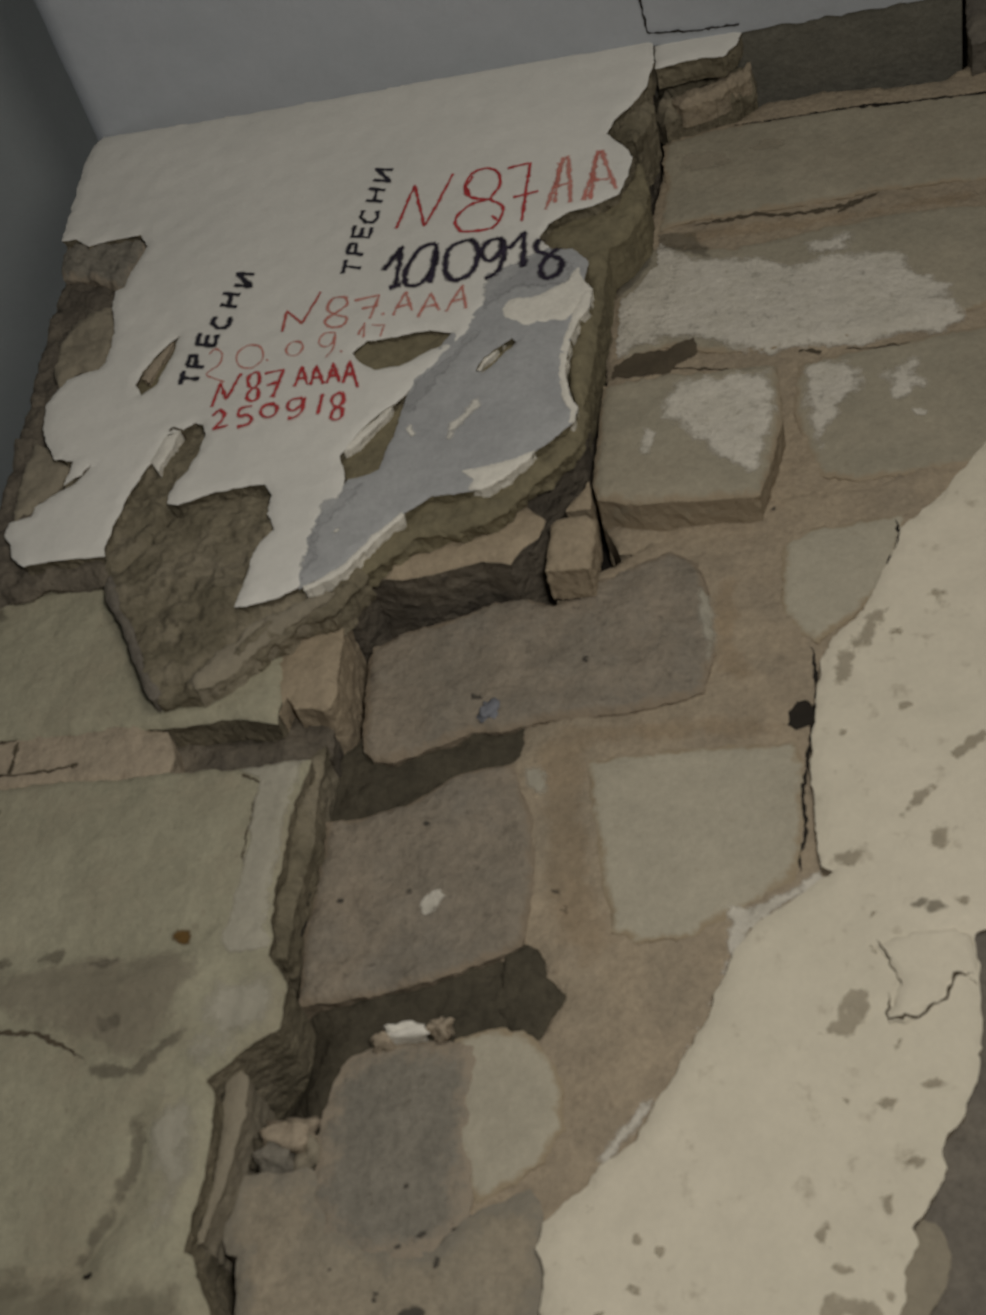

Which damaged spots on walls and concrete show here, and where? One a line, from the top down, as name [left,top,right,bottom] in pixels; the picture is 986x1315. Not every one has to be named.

crack [638,0,739,34]
peeling [0,62,758,713]
crack [886,521,901,564]
hole [787,700,815,730]
crack [0,739,78,777]
crack [798,646,819,873]
crack [876,939,973,1021]
crack [0,1029,83,1058]
flaking render [876,928,986,1315]